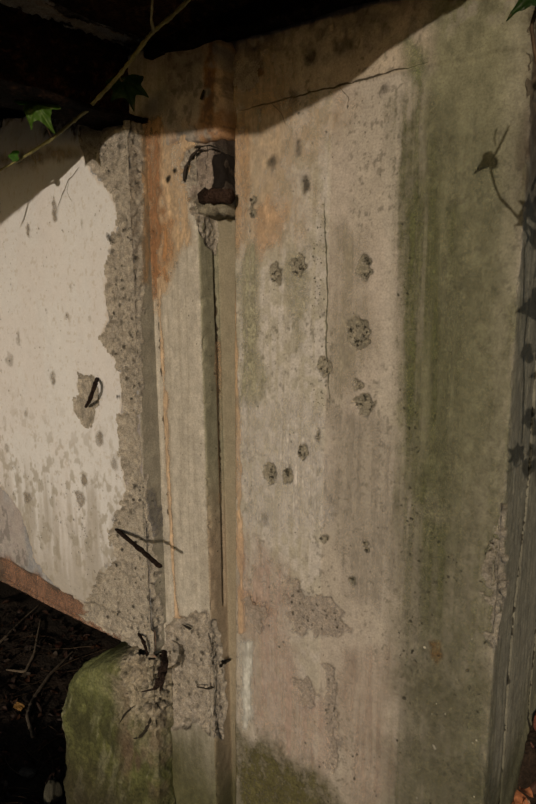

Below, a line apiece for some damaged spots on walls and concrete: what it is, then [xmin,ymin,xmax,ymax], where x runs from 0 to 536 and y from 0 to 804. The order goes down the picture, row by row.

crack [240,62,428,126]
spalling [72,120,236,740]
corrosion [115,116,194,619]
spalling [479,503,509,650]